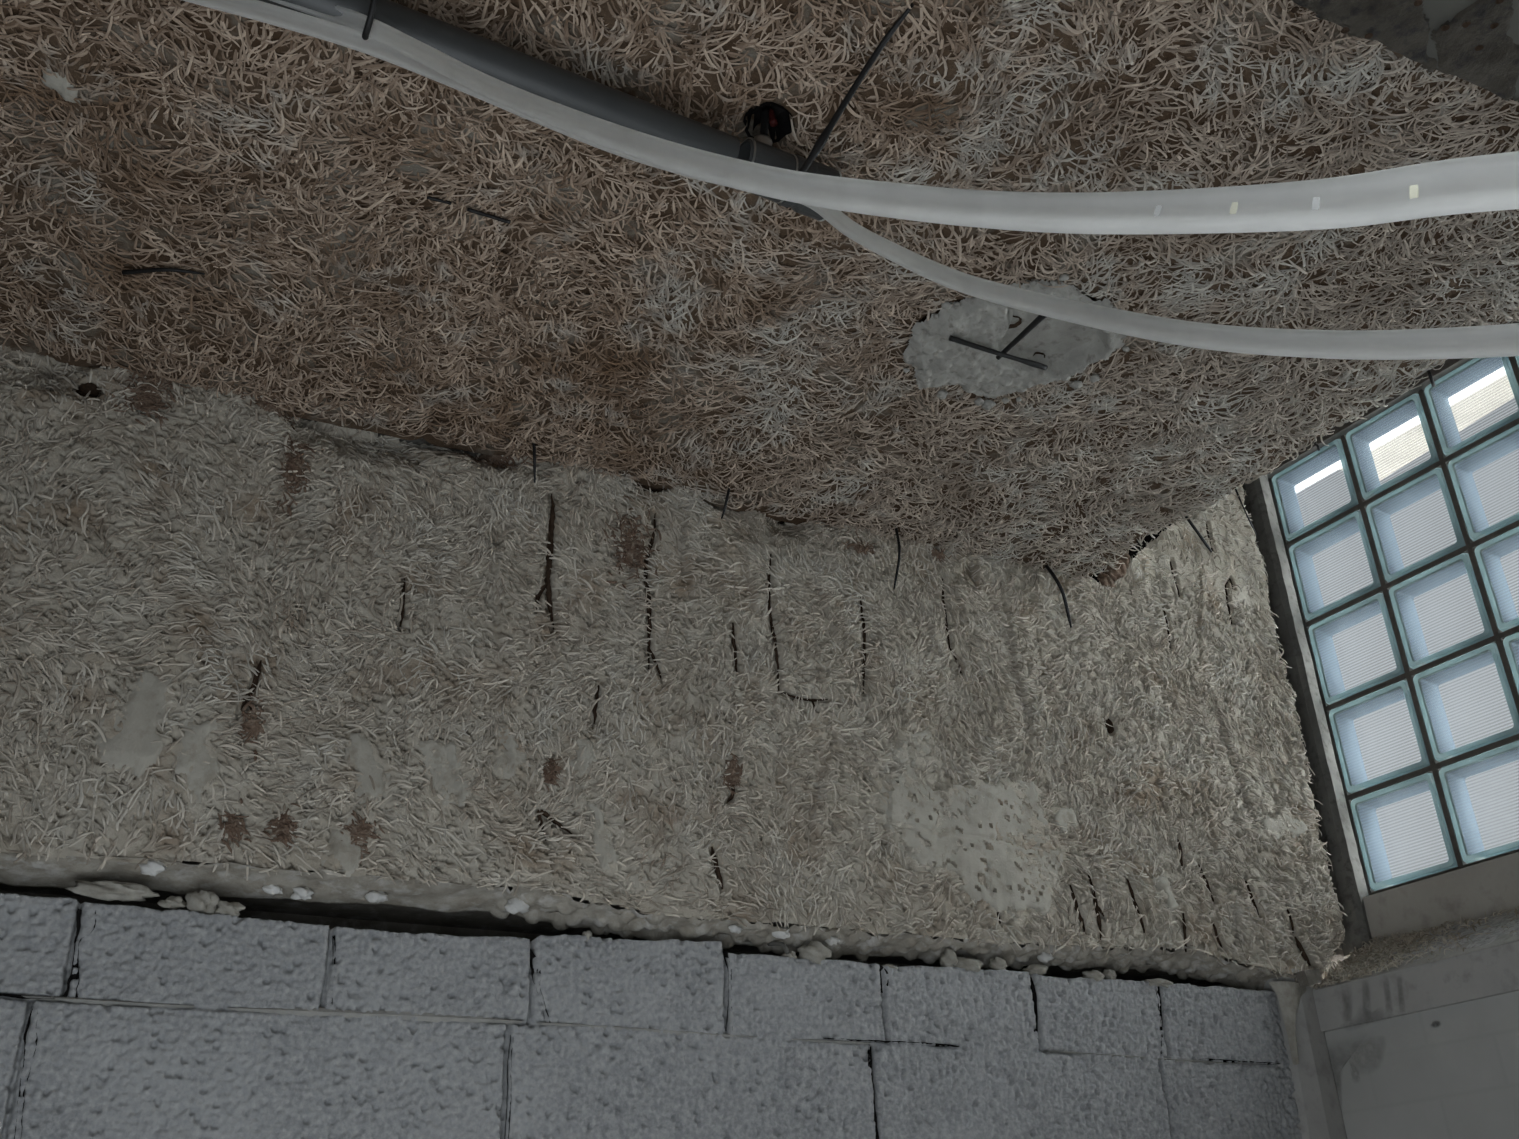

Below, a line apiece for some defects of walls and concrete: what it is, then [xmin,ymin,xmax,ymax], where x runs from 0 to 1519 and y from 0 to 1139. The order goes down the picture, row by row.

peeling [1291,0,1519,101]
spalling [903,297,1130,410]
crack [398,578,406,629]
crack [535,494,556,630]
crack [644,513,661,679]
crack [731,554,866,711]
crack [942,579,962,674]
crack [592,684,600,724]
crack [537,809,572,841]
crack [711,846,723,890]